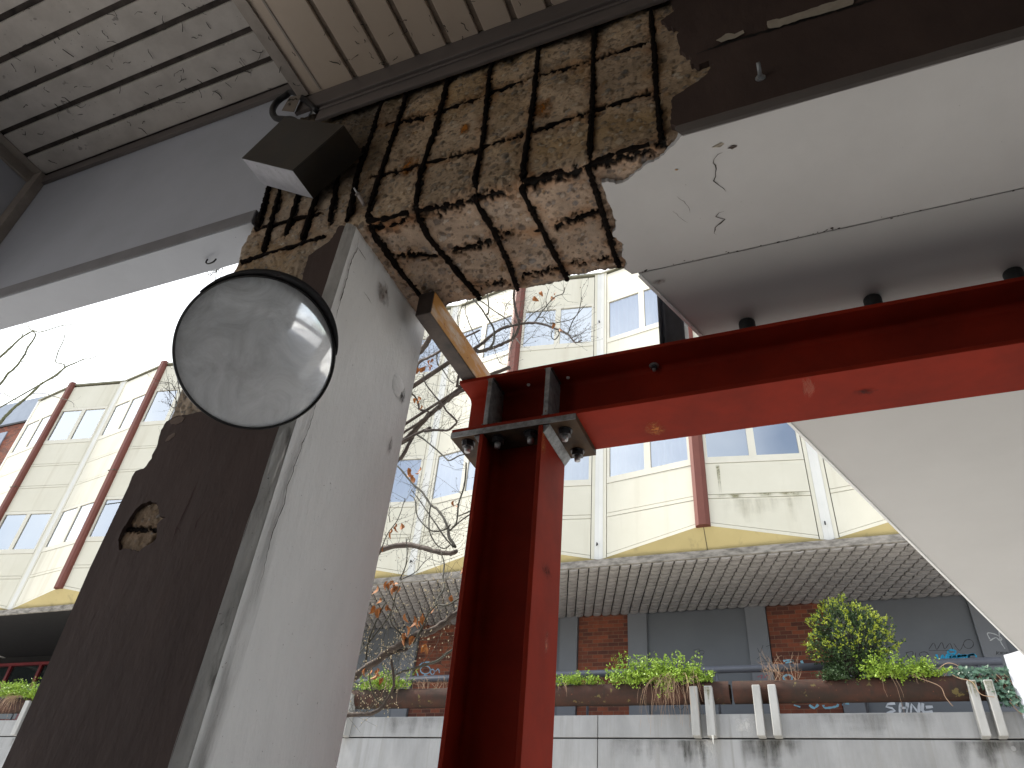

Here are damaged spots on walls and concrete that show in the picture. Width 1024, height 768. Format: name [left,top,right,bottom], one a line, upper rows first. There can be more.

spalling [234,0,710,312]
crack [642,152,1024,273]
spalling [165,390,201,442]
spalling [121,503,163,551]